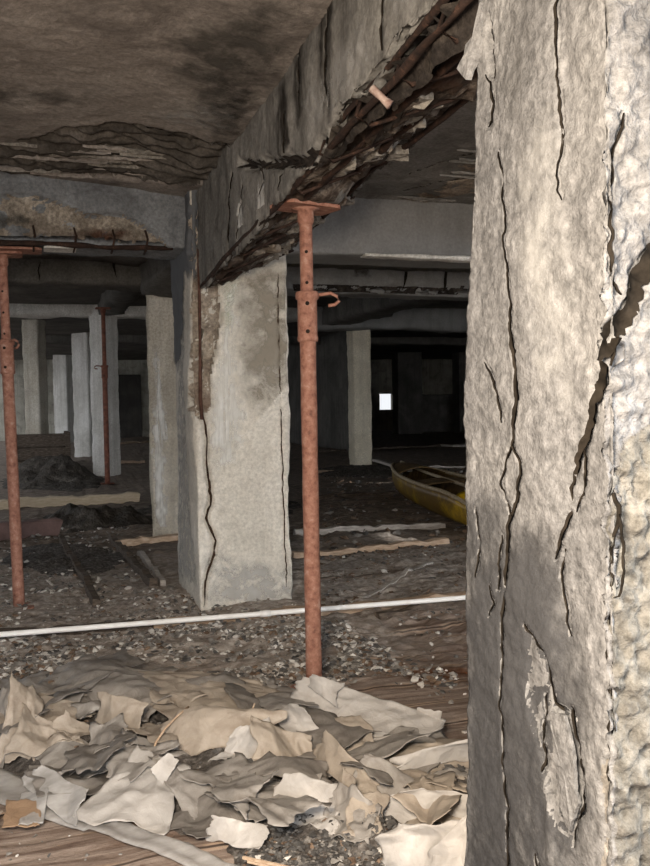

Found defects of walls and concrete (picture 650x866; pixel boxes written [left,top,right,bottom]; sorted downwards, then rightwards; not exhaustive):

spalling [0,194,173,255]
spalling [0,121,228,186]
water stain [183,13,273,128]
water stain [277,2,363,152]
spalling [187,0,496,420]
crack [553,0,565,200]
crack [555,112,650,636]
crack [203,419,217,605]
crack [474,152,586,866]
spalling [525,636,587,838]
crack [605,650,614,781]
spalling [601,425,650,866]